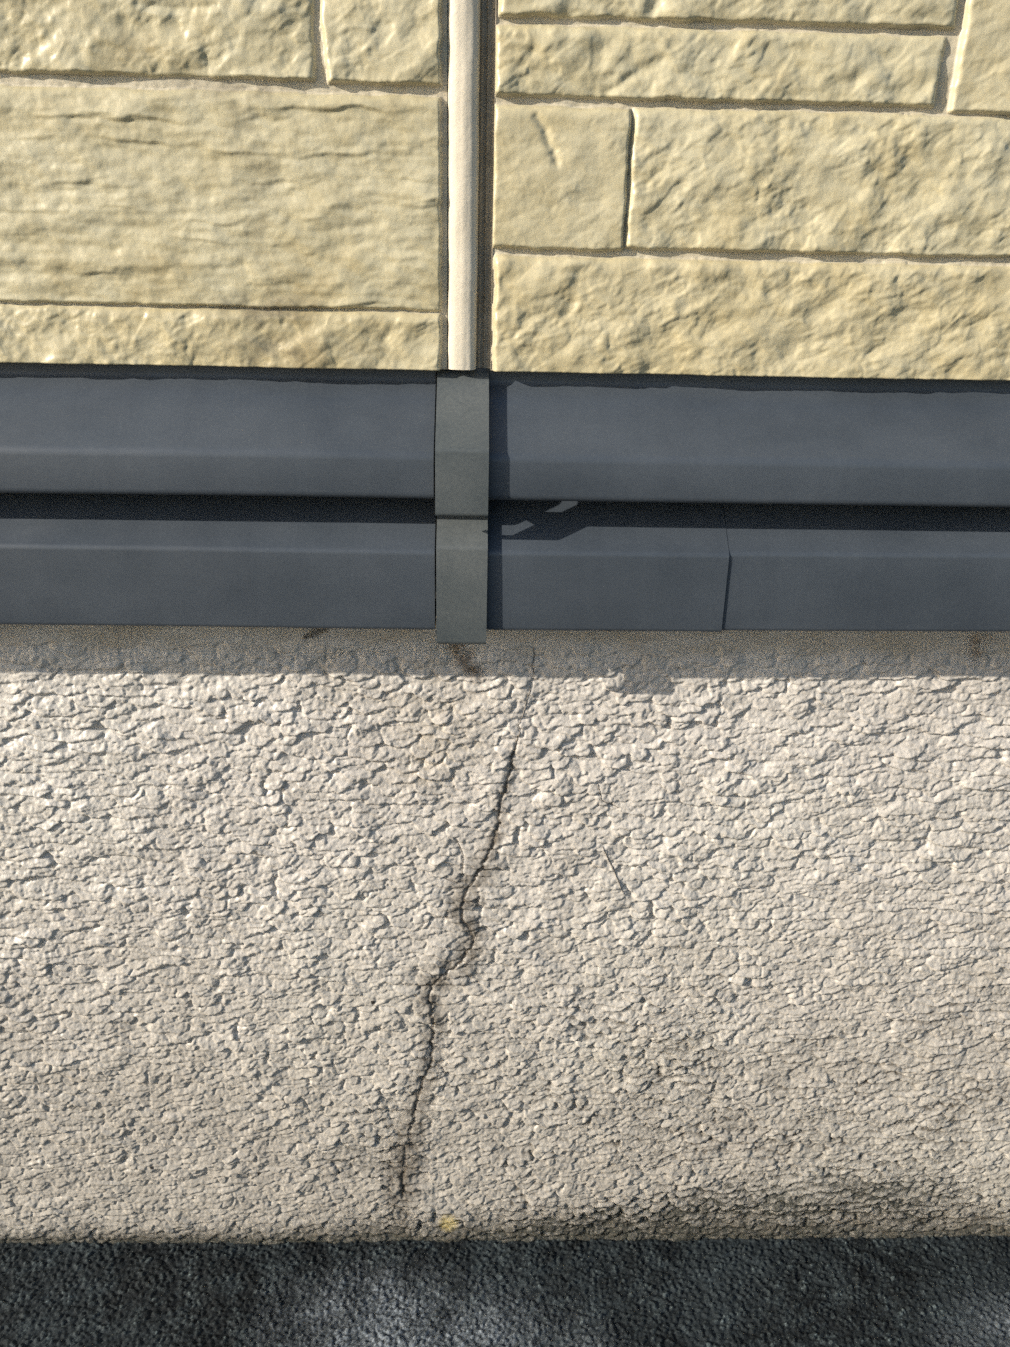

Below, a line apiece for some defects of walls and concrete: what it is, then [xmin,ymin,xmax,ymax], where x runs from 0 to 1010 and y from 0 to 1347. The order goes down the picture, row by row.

crack [402,647,535,1175]